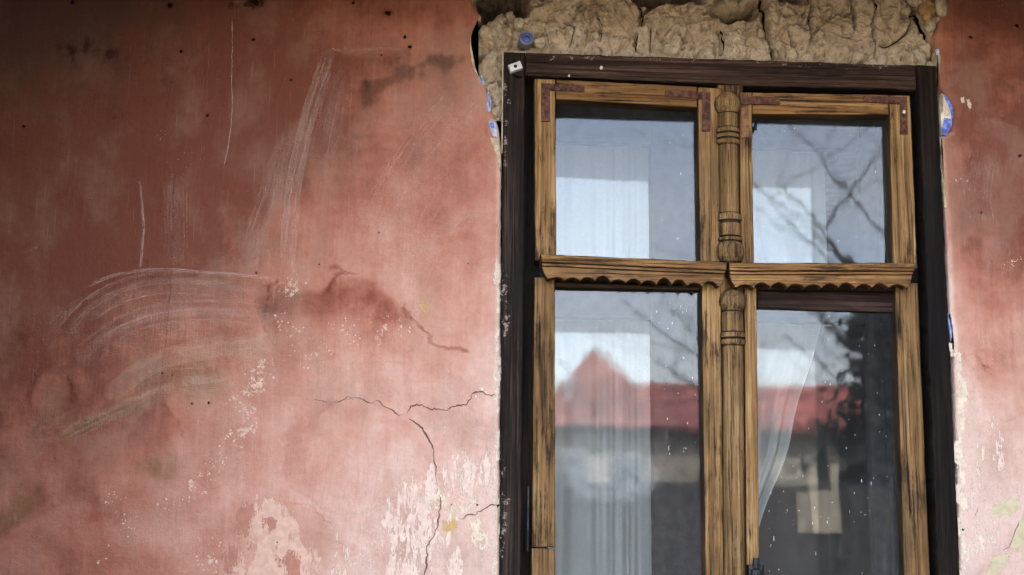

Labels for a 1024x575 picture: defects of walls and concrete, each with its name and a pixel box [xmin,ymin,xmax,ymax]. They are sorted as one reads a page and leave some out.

flaking render [470,9,501,172]
water stain [157,296,433,510]
peeling [233,255,501,575]
crack [315,388,499,575]
peeling [947,312,1024,575]